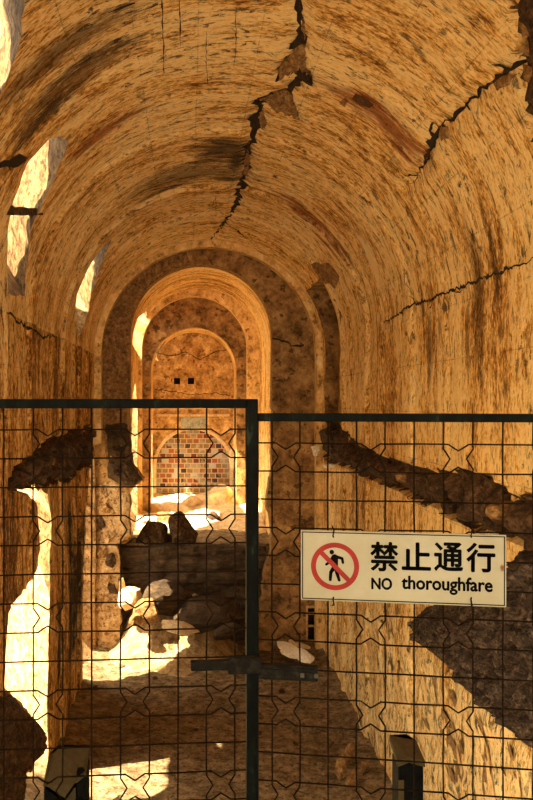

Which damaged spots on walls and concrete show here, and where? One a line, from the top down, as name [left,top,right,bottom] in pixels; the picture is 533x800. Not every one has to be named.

crack [211,0,313,239]
spalling [254,43,312,120]
crack [405,55,527,184]
crack [7,312,57,340]
spalling [311,262,339,289]
crack [383,257,533,323]
spalling [8,252,190,648]
peeling [319,422,533,800]